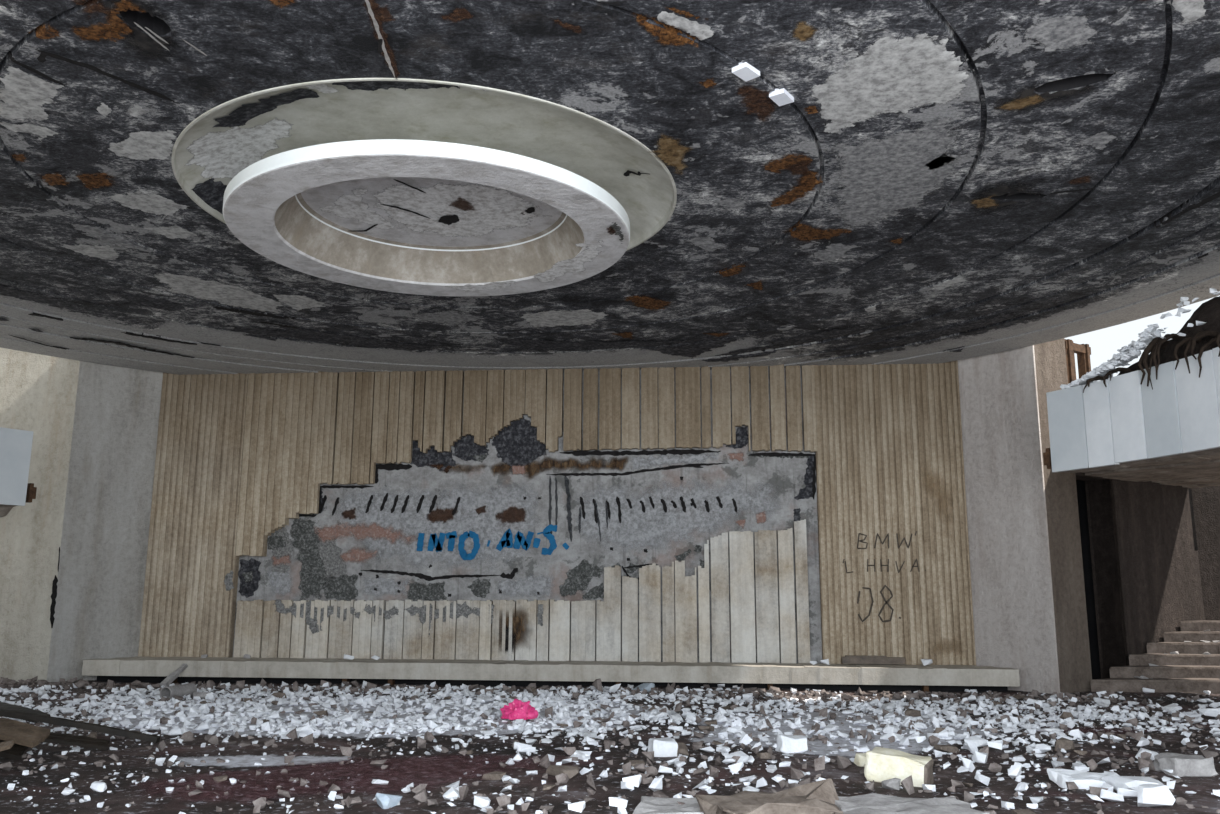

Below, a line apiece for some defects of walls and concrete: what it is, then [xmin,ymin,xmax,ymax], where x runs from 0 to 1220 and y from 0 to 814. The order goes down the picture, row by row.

rust [28,0,124,42]
flaking render [0,66,64,143]
flaking render [810,33,970,262]
flaking render [684,236,727,253]
flaking render [932,273,966,290]
flaking render [224,415,816,635]